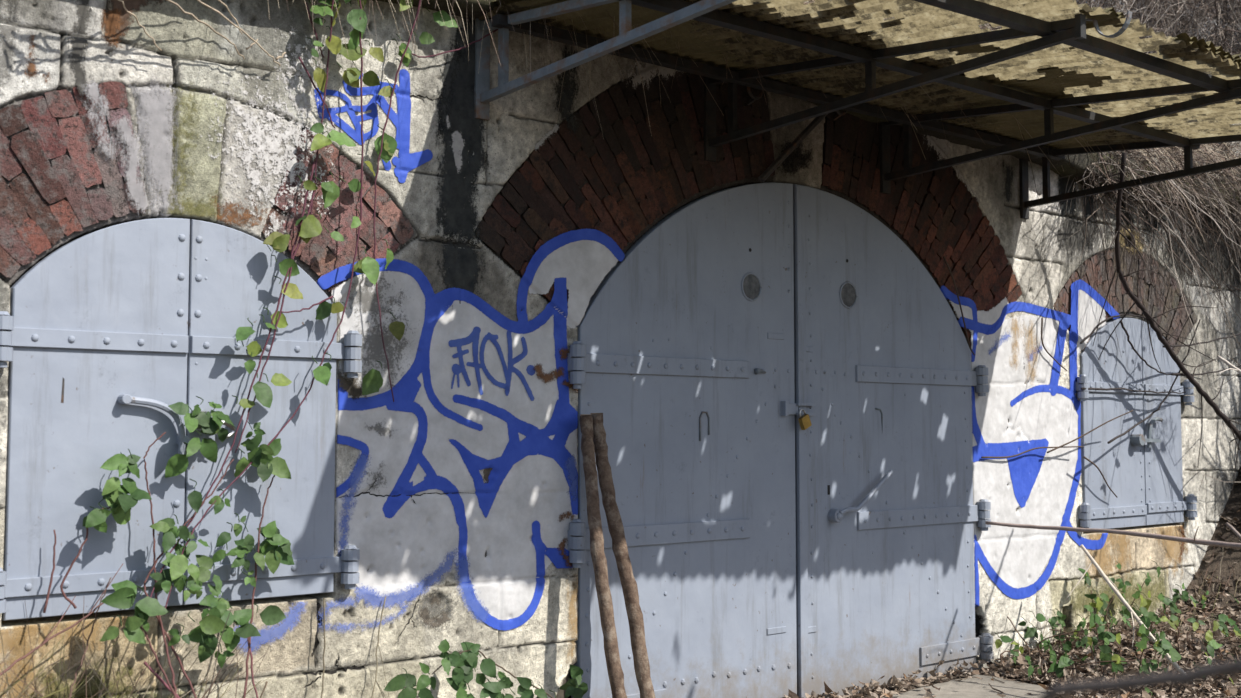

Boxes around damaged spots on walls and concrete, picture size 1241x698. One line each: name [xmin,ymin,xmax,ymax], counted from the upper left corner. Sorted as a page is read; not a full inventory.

leakage [434,17,489,308]
leakage [535,46,582,151]